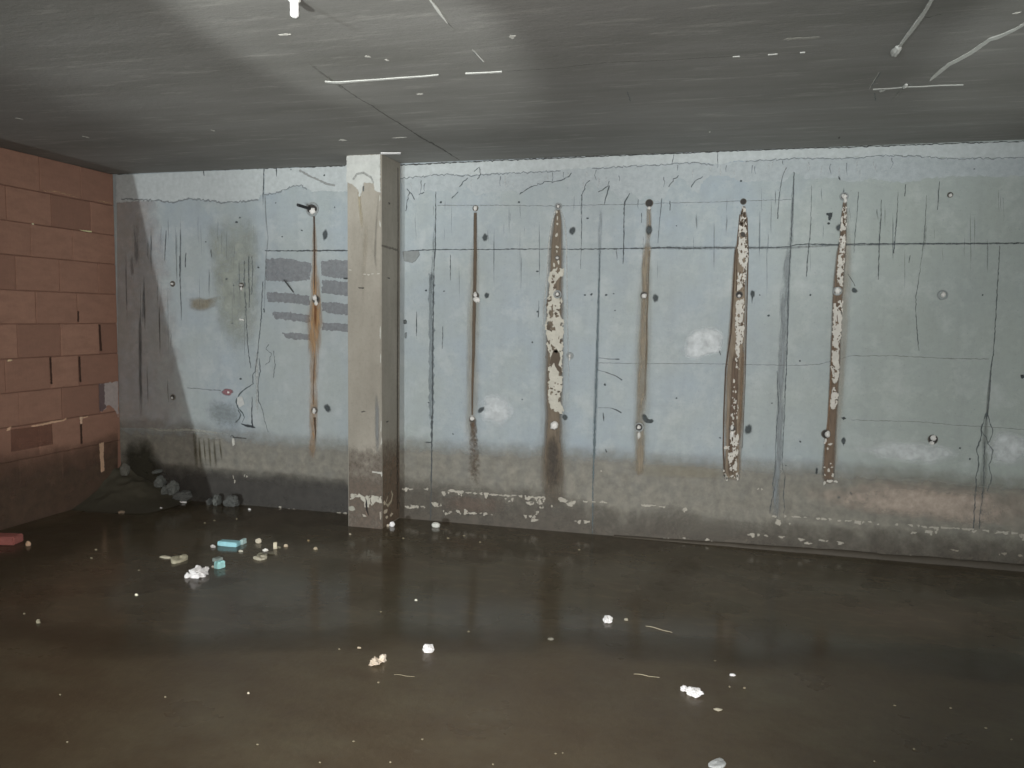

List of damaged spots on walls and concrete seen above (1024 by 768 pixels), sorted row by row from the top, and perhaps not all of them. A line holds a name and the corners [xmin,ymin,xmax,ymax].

crack [191,250,348,446]
rust [310,216,321,439]
peeling [346,154,381,214]
rust [470,212,478,470]
rust [544,209,568,491]
rust [638,209,651,409]
crack [340,85,1024,533]
rust [722,206,749,481]
rust [823,202,847,485]
water stain [0,405,1024,564]